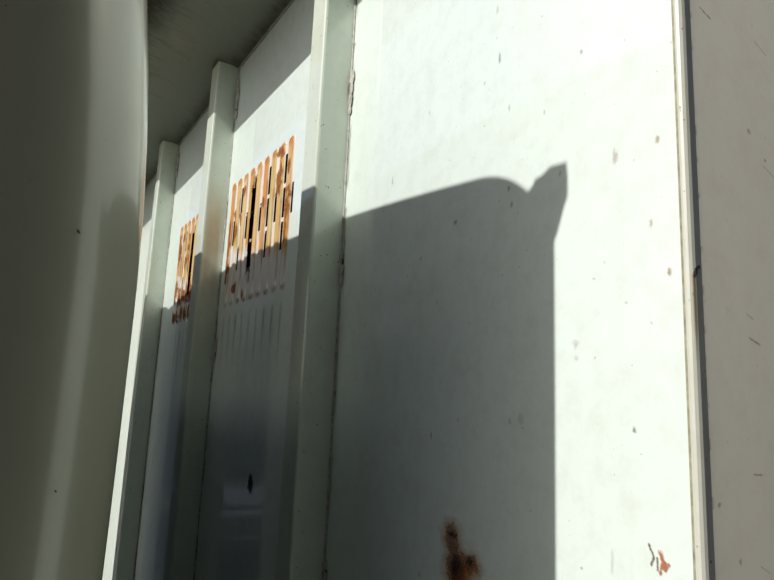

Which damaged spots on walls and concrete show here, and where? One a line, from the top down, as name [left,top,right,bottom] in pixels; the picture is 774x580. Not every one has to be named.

rust [233,136,293,241]
rust [224,211,250,300]
rust [444,522,478,580]